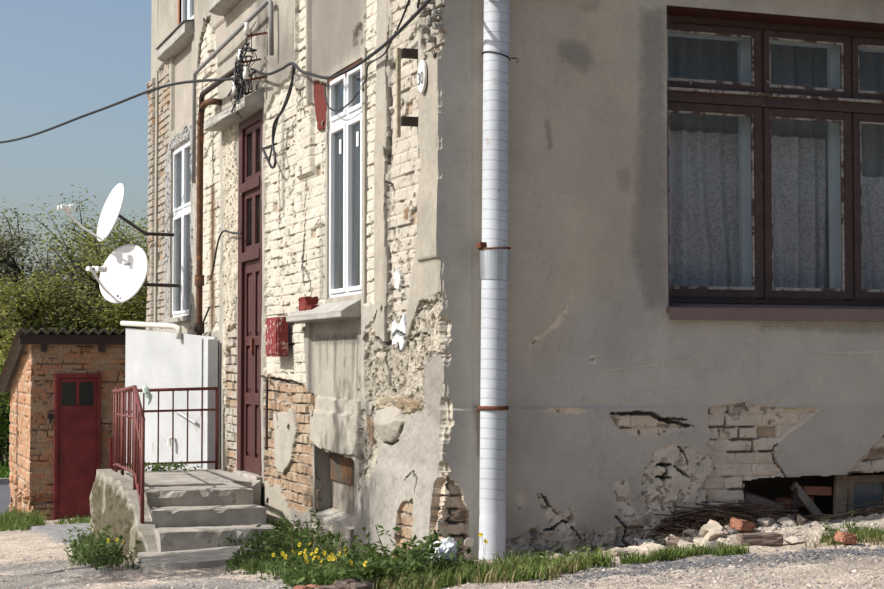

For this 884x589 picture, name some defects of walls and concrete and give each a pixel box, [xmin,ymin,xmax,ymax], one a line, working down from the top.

flaking render [261,0,327,514]
crack [278,162,313,292]
flaking render [352,0,454,495]
crack [370,16,439,386]
flaking render [391,498,413,556]
flaking render [429,462,474,560]
flaking render [506,401,820,557]
flaking render [848,434,884,474]